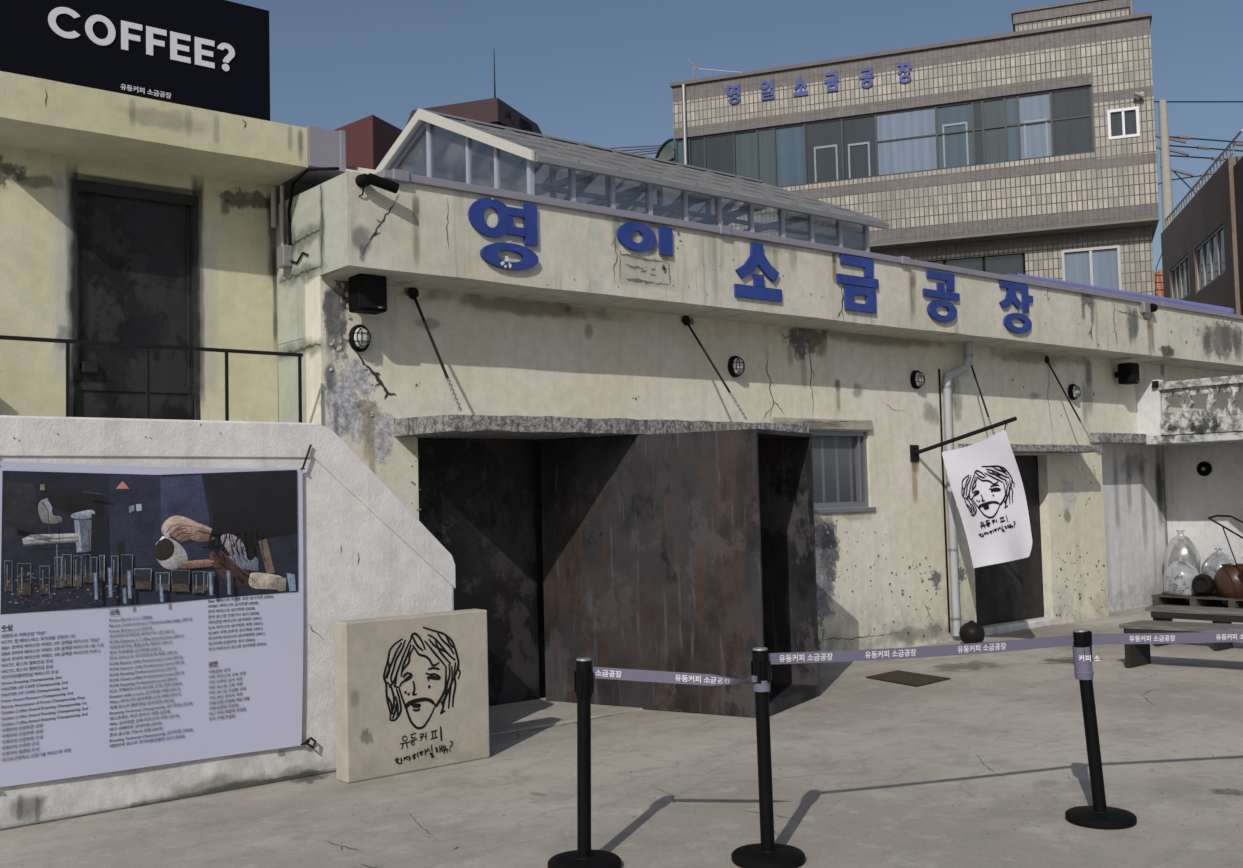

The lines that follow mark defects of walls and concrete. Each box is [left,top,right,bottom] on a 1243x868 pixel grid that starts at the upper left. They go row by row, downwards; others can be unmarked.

crack [360,195,399,258]
water stain [355,398,380,417]
crack [356,352,396,398]
crack [762,357,900,429]